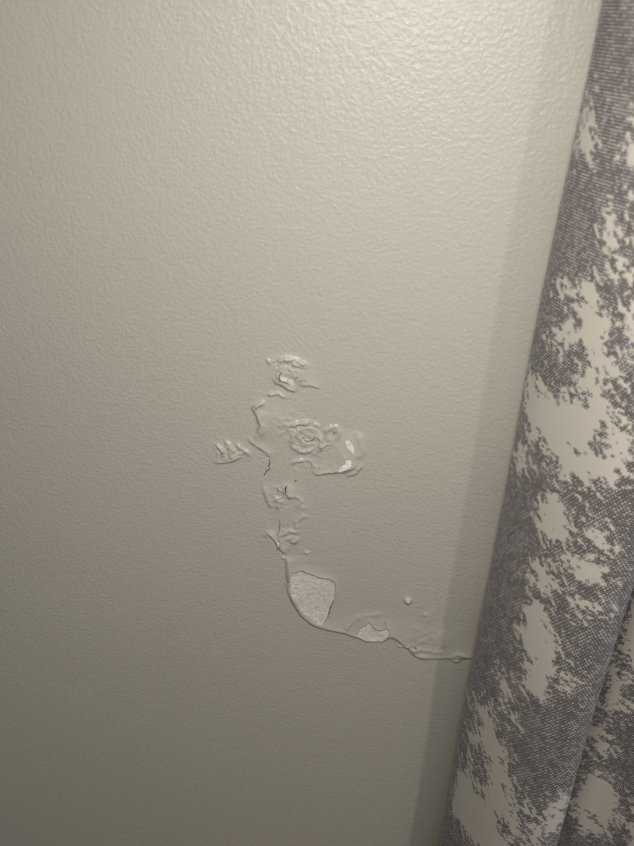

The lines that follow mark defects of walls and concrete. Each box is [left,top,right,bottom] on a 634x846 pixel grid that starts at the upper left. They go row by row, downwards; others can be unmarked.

peeling [280,563,398,647]